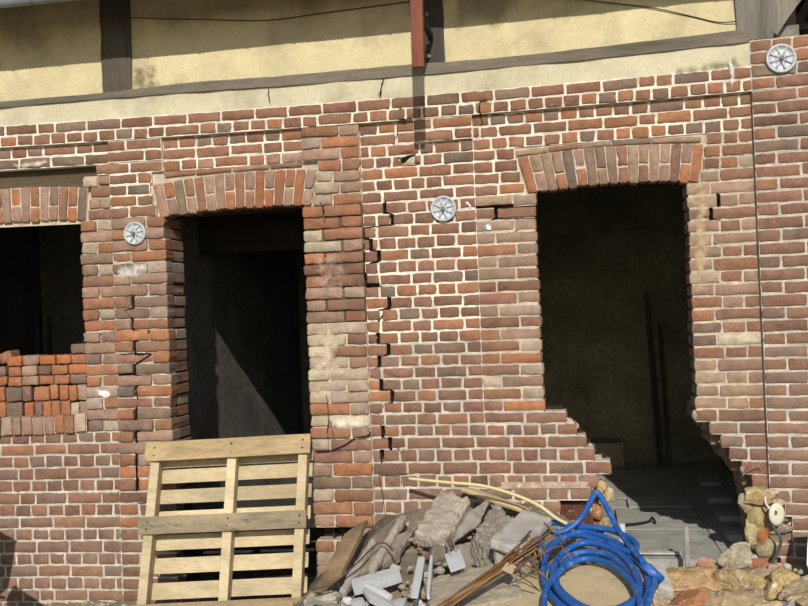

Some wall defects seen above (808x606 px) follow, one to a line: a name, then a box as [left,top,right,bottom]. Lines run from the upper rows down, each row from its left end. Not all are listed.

crack [363,201,408,485]
spalling [501,479,615,534]
spalling [686,400,794,562]